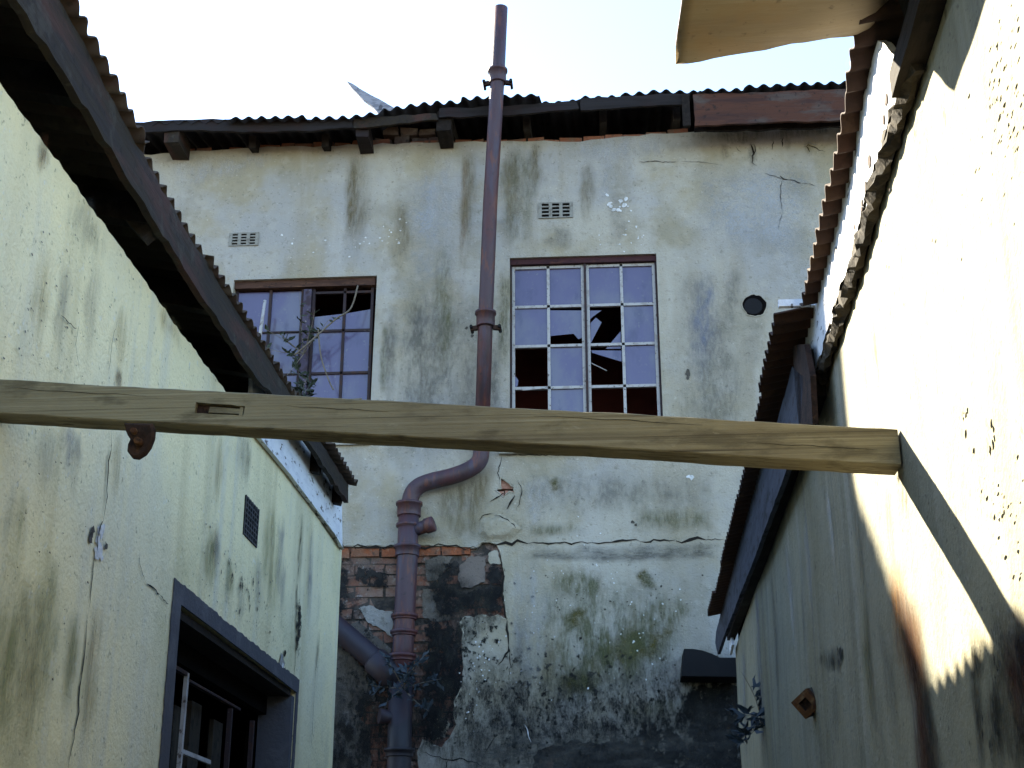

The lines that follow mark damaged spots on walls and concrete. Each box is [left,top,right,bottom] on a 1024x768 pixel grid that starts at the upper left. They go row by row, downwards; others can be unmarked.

crack [736,139,823,224]
crack [68,434,112,767]
peeling [89,524,108,561]
spalling [332,645,377,768]
crack [344,542,394,550]
spalling [351,605,393,653]
spalling [417,541,561,753]
spalling [495,477,515,497]
crack [421,536,722,675]
damp [412,561,742,768]